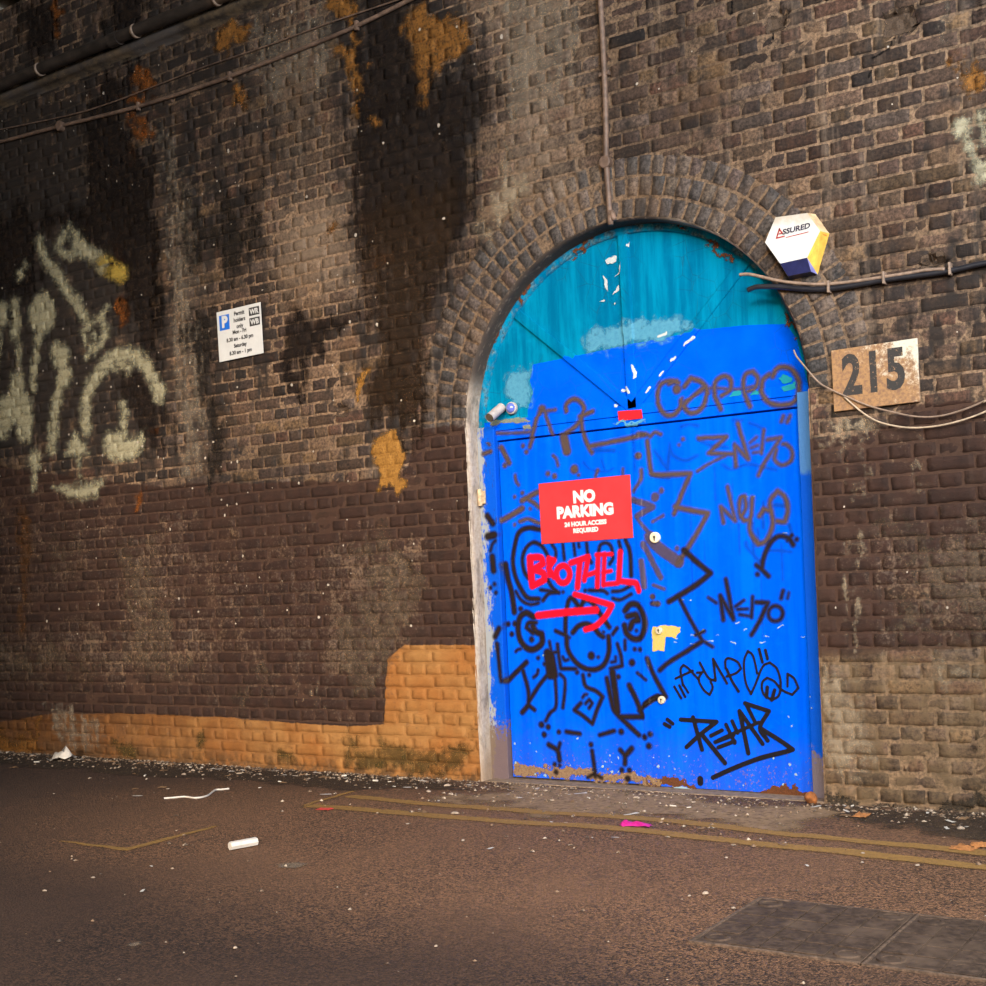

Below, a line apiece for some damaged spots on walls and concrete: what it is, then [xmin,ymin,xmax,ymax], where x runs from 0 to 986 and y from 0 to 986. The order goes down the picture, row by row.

corrosion [213,17,251,58]
damp [171,175,266,288]
damp [349,0,530,431]
damp [283,308,346,403]
damp [822,667,878,779]